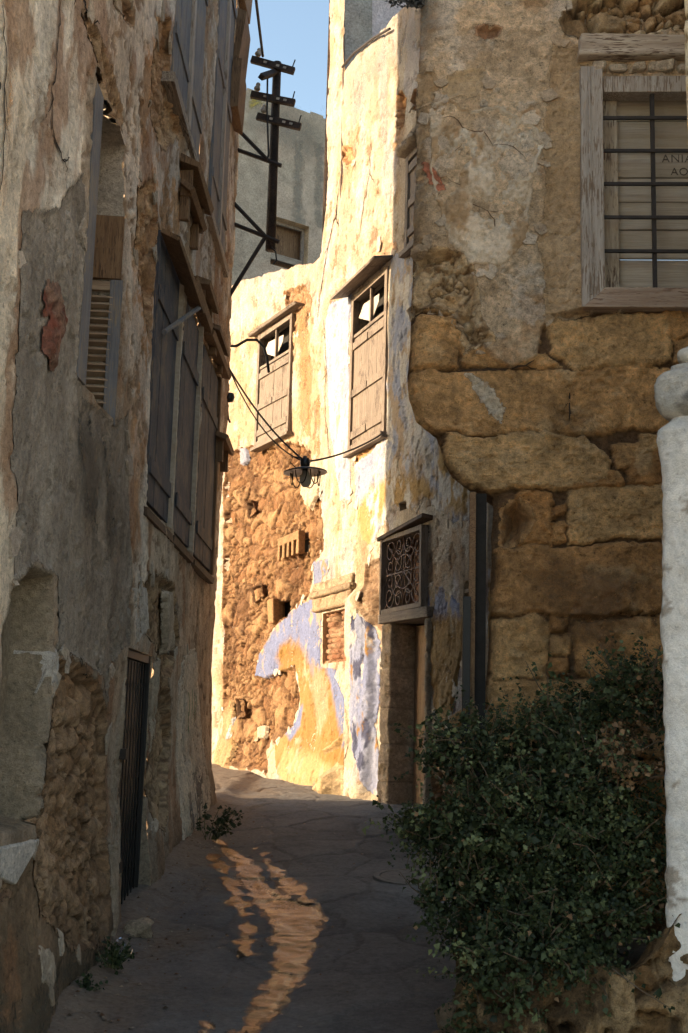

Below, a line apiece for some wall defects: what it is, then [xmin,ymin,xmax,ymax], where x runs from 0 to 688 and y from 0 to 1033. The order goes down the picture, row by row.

crack [0,5,8,190]
spalling [81,0,126,133]
spalling [113,0,136,29]
spalling [148,0,181,151]
crack [444,116,528,163]
spalling [214,0,687,796]
peeling [8,171,211,1006]
water stain [206,839,328,1033]